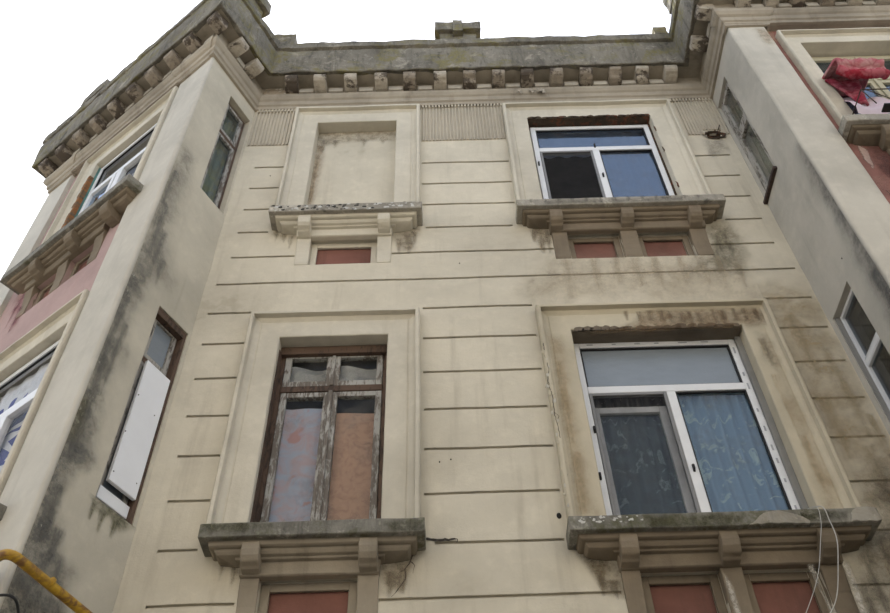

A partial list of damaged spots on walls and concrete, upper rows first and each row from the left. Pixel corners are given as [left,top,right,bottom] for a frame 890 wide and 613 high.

leakage [74,186,137,237]
leakage [854,233,890,303]
leakage [22,202,167,584]
crack [543,343,561,438]
crack [391,555,415,597]